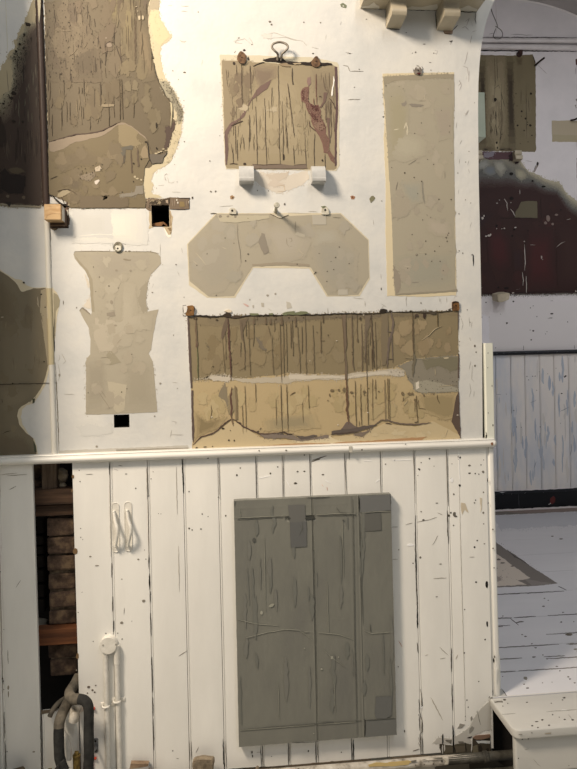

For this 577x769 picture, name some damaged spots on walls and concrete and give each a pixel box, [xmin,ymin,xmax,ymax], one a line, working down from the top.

peeling [0,270,64,456]
spalling [60,463,74,492]
peeling [0,0,193,238]
peeling [183,53,468,461]
peeling [478,53,577,299]
spalling [39,645,79,721]